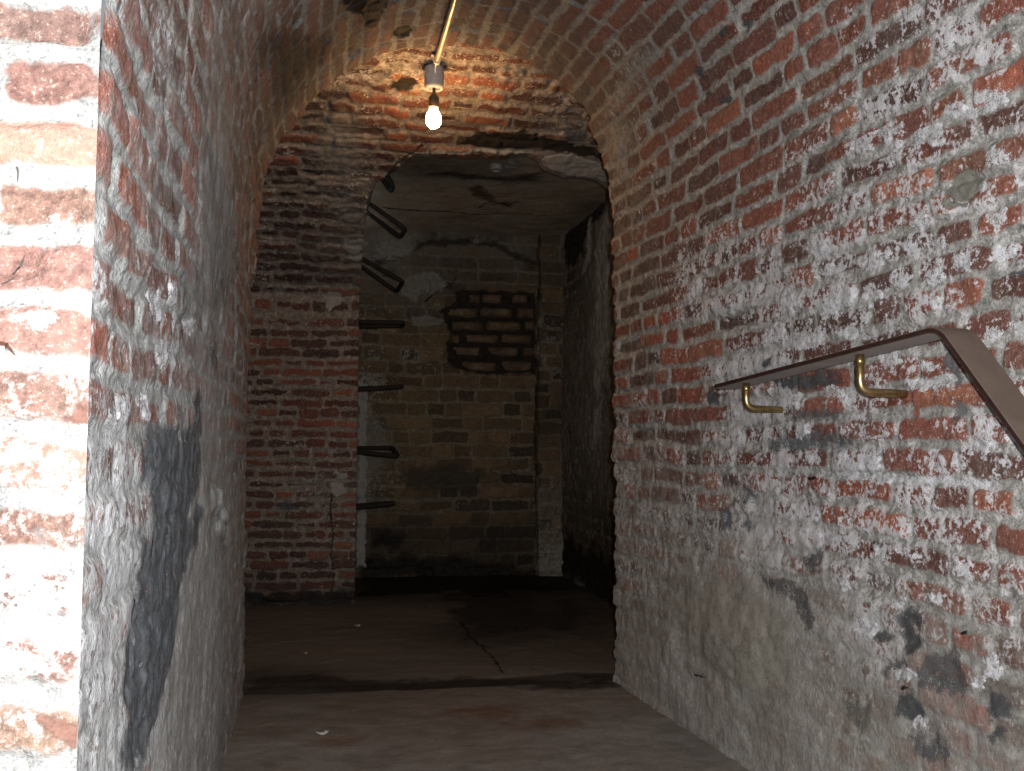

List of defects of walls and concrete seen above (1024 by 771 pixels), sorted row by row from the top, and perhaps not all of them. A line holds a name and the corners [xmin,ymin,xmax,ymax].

water stain [194,389,202,434]
water stain [194,500,204,545]
crack [327,493,335,593]